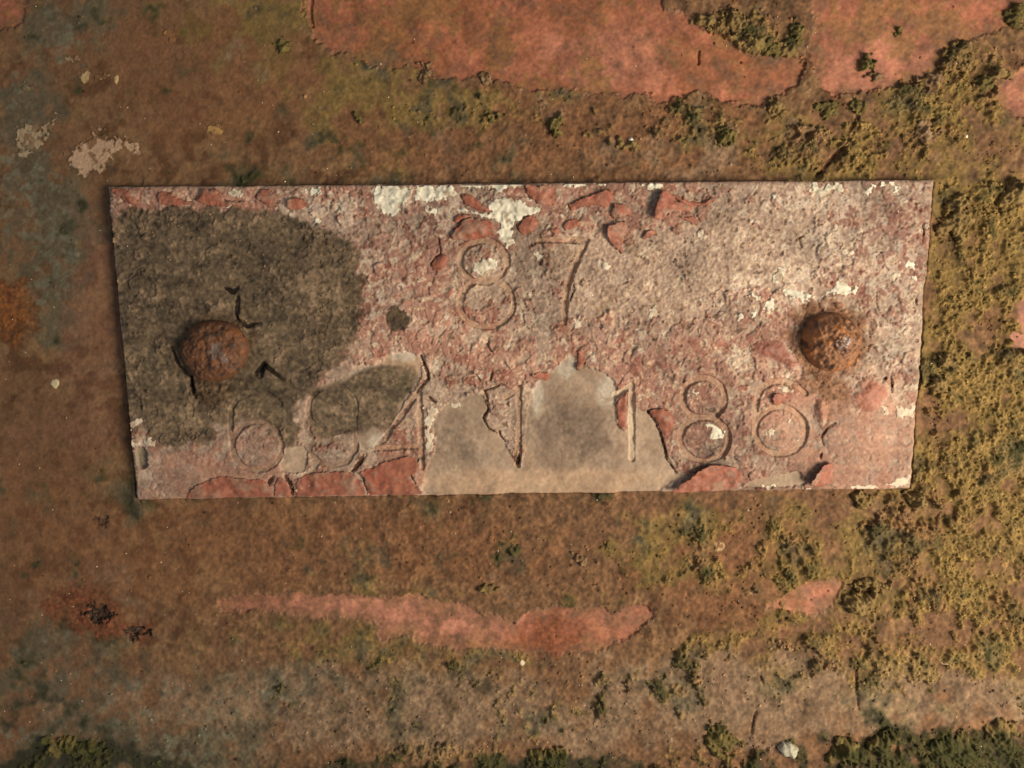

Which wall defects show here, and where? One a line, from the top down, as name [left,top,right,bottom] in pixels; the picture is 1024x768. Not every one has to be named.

peeling [299,0,1024,109]
peeling [996,66,1024,119]
peeling [373,184,632,254]
peeling [642,184,715,240]
rust [787,301,867,418]
peeling [187,350,834,498]
peeling [850,474,911,489]